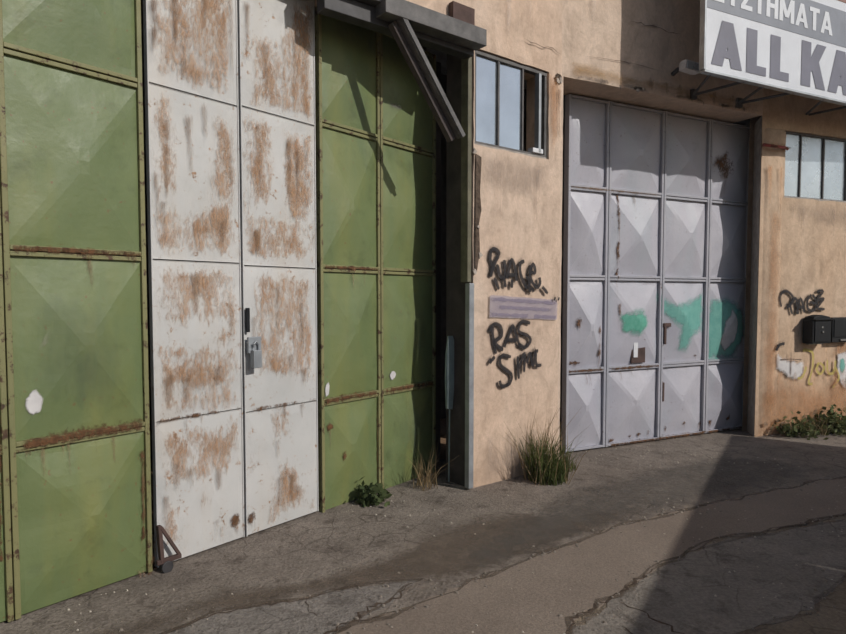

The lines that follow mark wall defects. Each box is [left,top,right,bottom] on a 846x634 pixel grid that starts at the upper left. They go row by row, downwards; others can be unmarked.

rust [153,0,229,87]
rust [256,6,310,114]
rust [248,127,311,256]
rust [714,153,732,178]
rust [13,246,140,260]
rust [194,207,230,252]
rust [256,278,311,374]
rust [160,348,233,423]
rust [24,419,143,455]
rust [231,513,256,527]